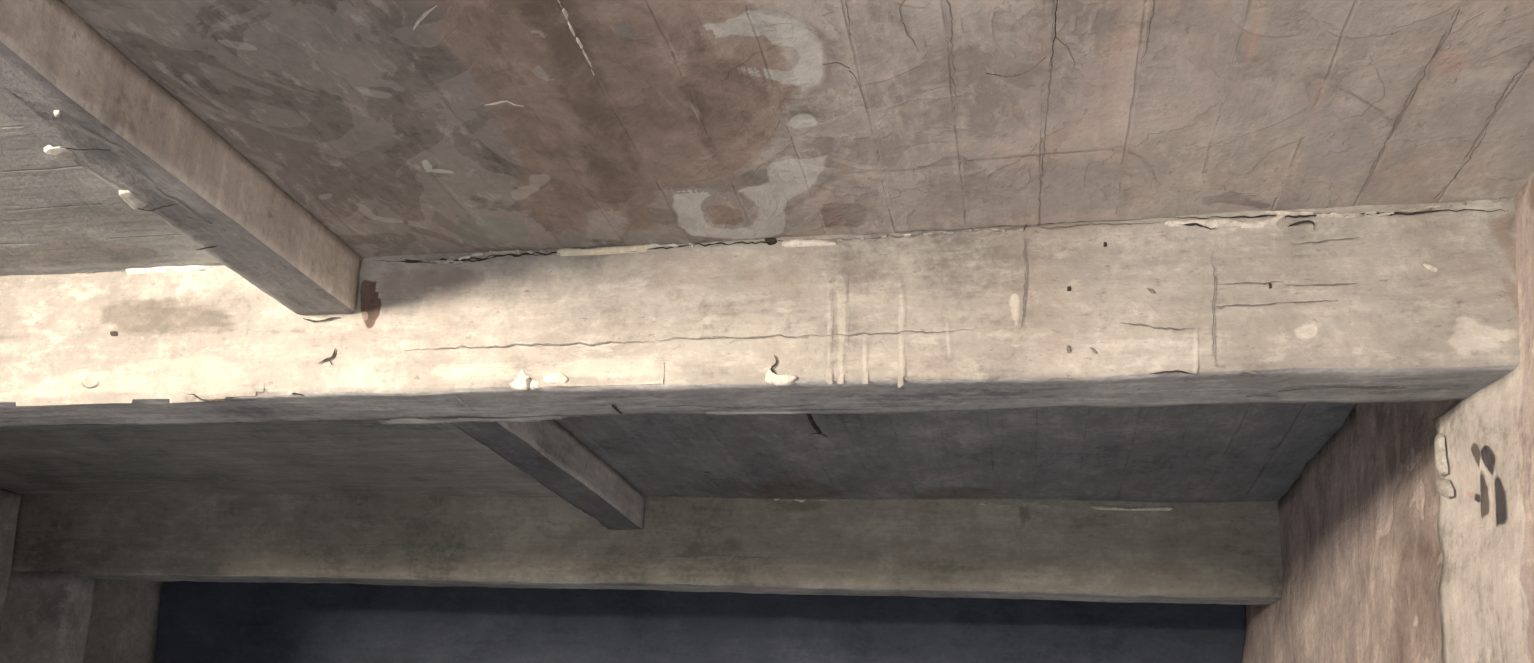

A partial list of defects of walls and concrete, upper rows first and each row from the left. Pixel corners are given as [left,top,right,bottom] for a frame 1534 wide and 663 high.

peeling [695,8,830,89]
leakage [406,0,869,388]
peeling [399,112,974,264]
crack [599,0,1534,397]
corrosion [358,278,384,330]
leakage [375,261,492,305]
crack [381,252,560,263]
leakage [896,275,906,388]
leakage [1007,291,1023,329]
crack [612,405,829,438]